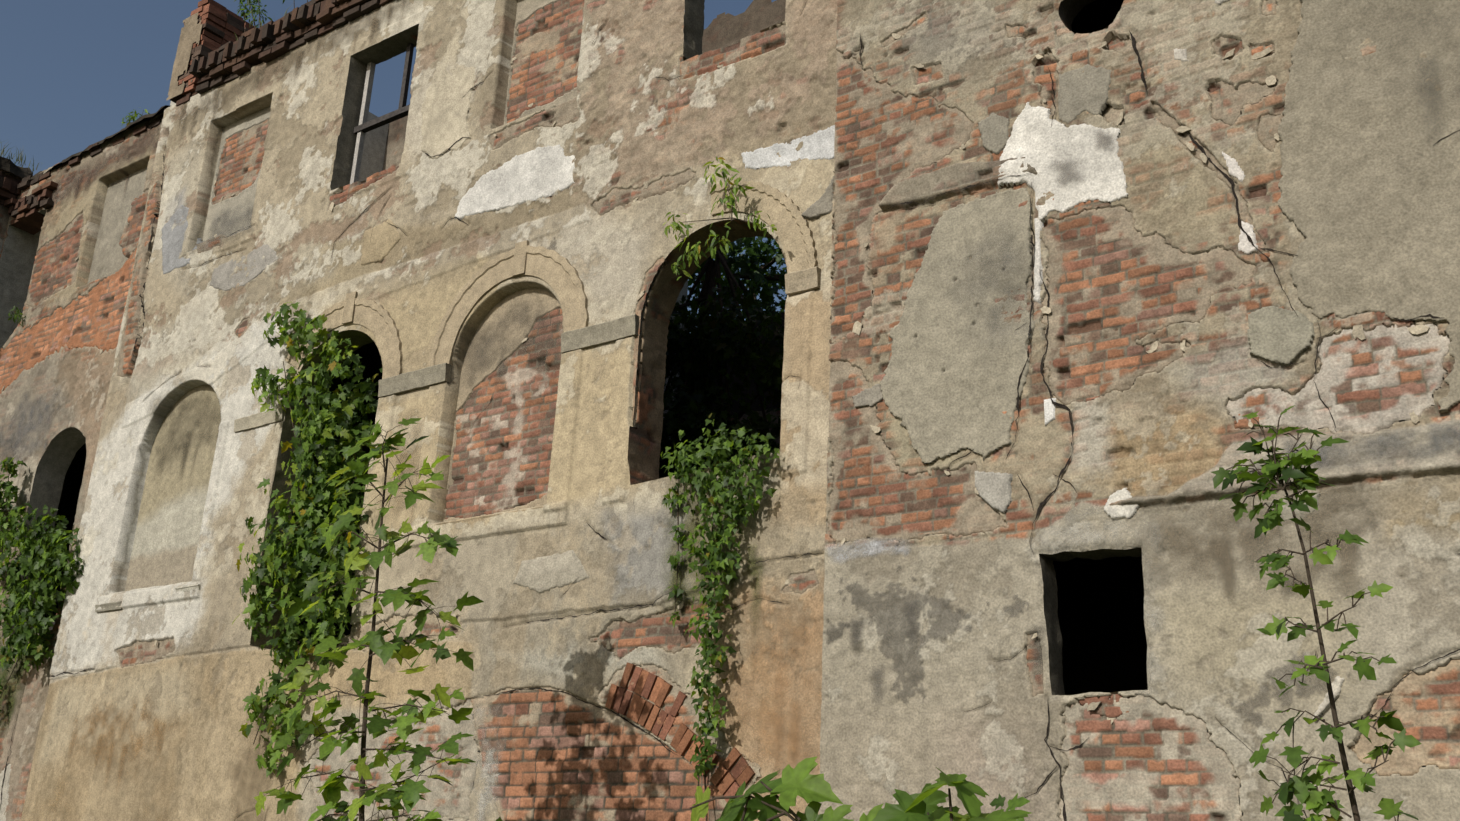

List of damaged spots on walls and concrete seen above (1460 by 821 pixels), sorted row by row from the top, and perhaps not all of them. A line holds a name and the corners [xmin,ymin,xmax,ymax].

spalling [0,182,162,394]
spalling [445,307,563,519]
spalling [828,51,1007,549]
crack [876,173,1077,555]
crack [1129,30,1338,431]
flaking render [1207,0,1460,435]
crack [1392,314,1440,322]
flaking render [303,599,761,821]
crack [1024,701,1087,821]
spalling [1059,693,1242,821]
crack [1215,717,1313,800]
spalling [1350,659,1460,776]